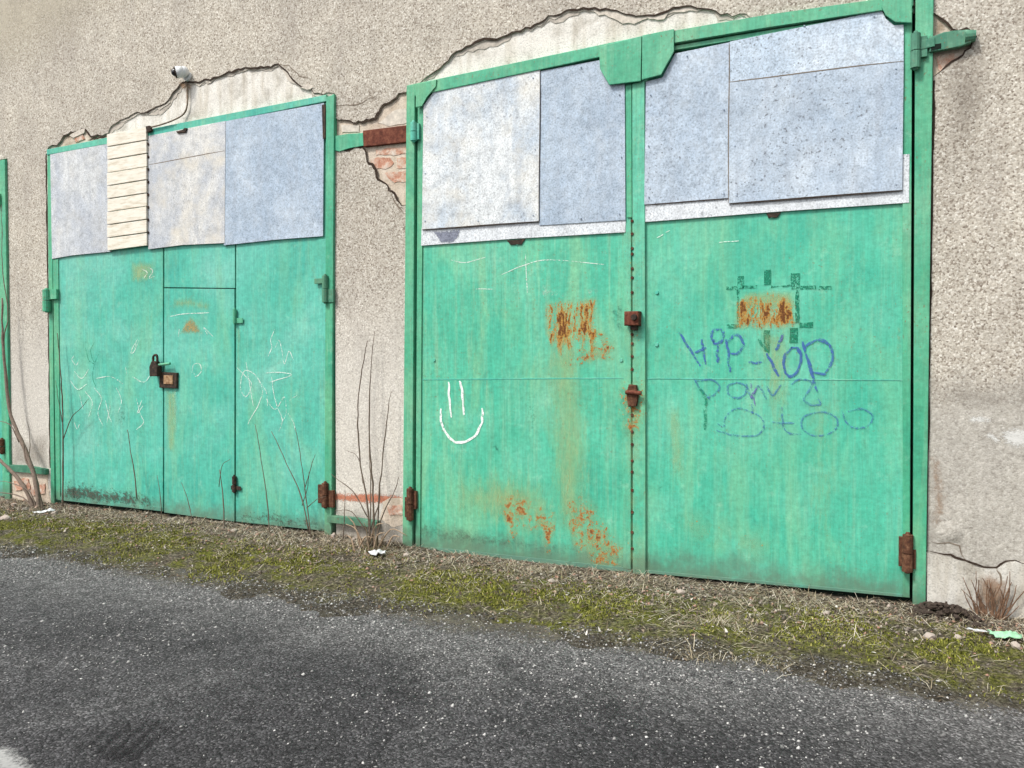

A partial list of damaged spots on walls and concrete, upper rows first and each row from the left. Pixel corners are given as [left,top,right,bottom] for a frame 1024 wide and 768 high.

flaking render [422,5,750,82]
flaking render [933,13,977,77]
flaking render [49,63,335,149]
flaking render [337,91,407,136]
flaking render [344,143,406,206]
rust [546,300,614,369]
rust [737,293,795,329]
crack [927,80,936,513]
rust [619,354,644,430]
rust [500,490,555,551]
rust [566,497,632,566]
crack [926,539,1024,588]